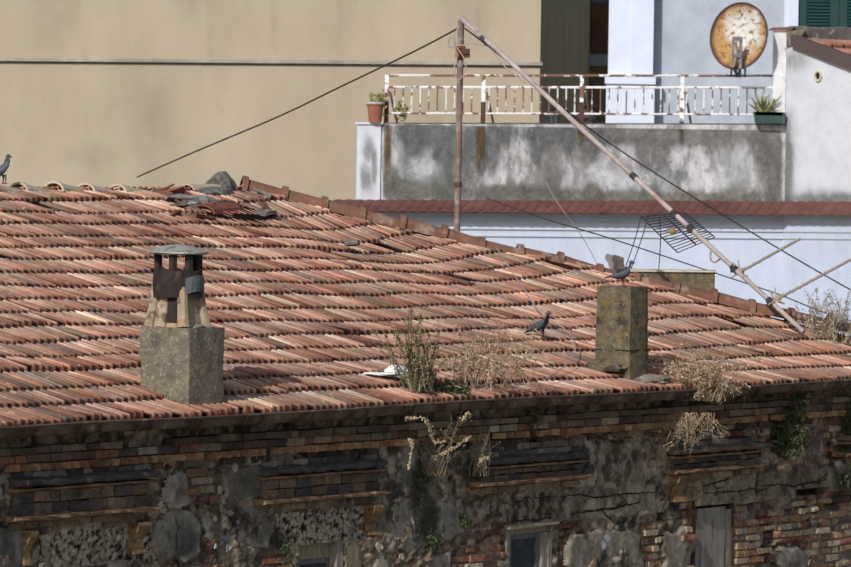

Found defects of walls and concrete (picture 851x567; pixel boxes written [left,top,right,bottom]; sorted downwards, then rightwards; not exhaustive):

leakage [361,124,851,202]
peeling [0,527,51,567]
peeling [148,466,294,567]
peeling [372,437,504,567]
crack [497,492,674,523]
crack [703,474,829,497]
spalling [734,505,851,567]